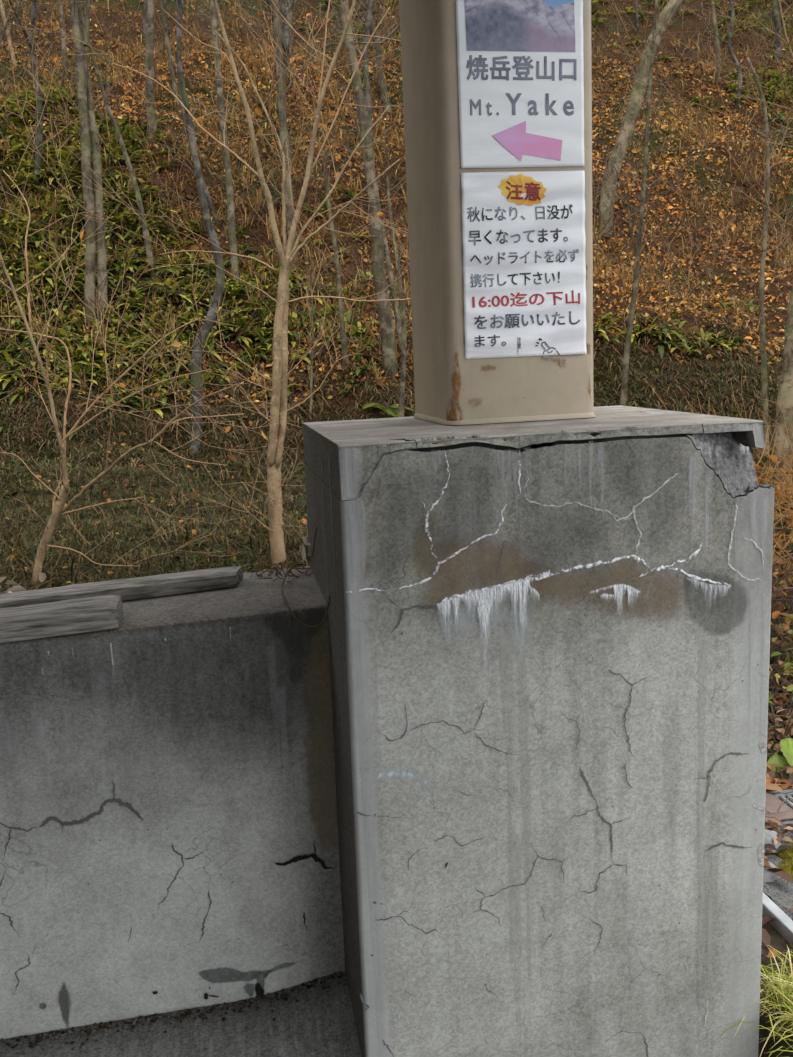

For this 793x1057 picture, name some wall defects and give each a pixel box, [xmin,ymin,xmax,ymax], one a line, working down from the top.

rust [447,353,462,426]
spalling [687,432,775,497]
crack [350,410,764,633]
water stain [420,525,672,640]
crack [363,699,519,755]
crack [589,653,651,791]
crack [0,779,143,886]
crack [128,844,210,941]
crack [275,846,338,869]
crack [475,710,627,928]
crack [697,752,749,803]
crack [706,842,750,851]